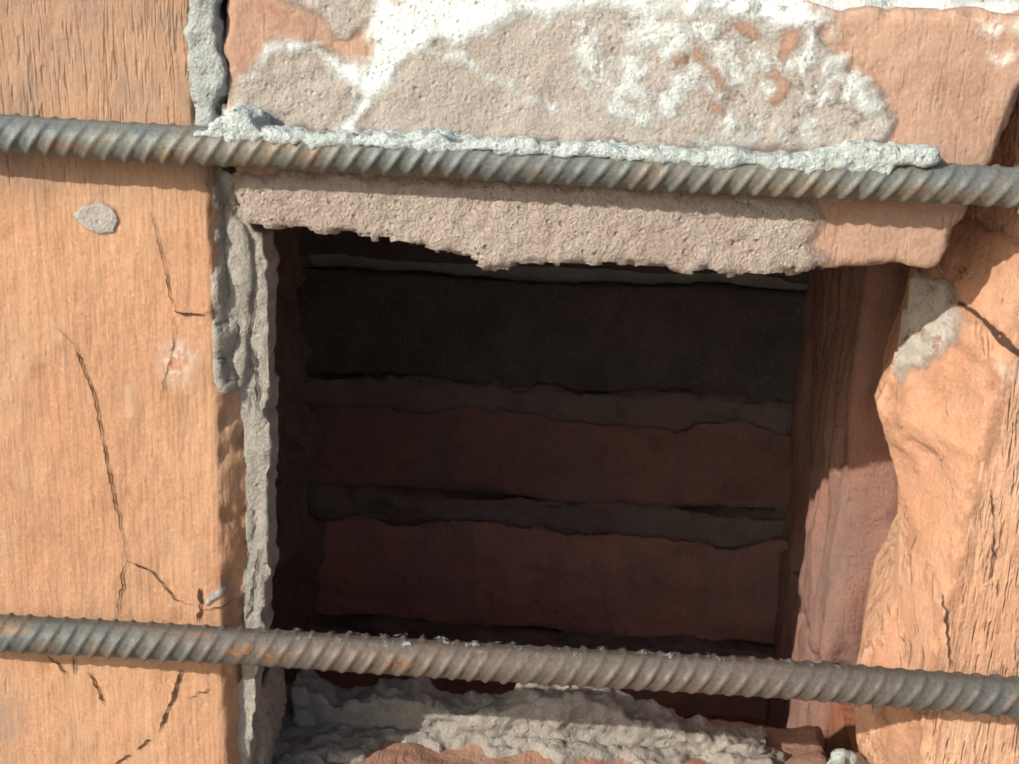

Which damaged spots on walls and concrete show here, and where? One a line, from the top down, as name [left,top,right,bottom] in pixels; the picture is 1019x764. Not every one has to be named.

damp [264,0,882,135]
spalling [232,170,828,277]
crack [151,214,215,400]
crack [249,291,259,408]
crack [950,300,1019,357]
crack [59,329,259,620]
crack [989,487,997,575]
crack [47,656,103,702]
crack [115,670,211,764]
crack [941,593,950,668]